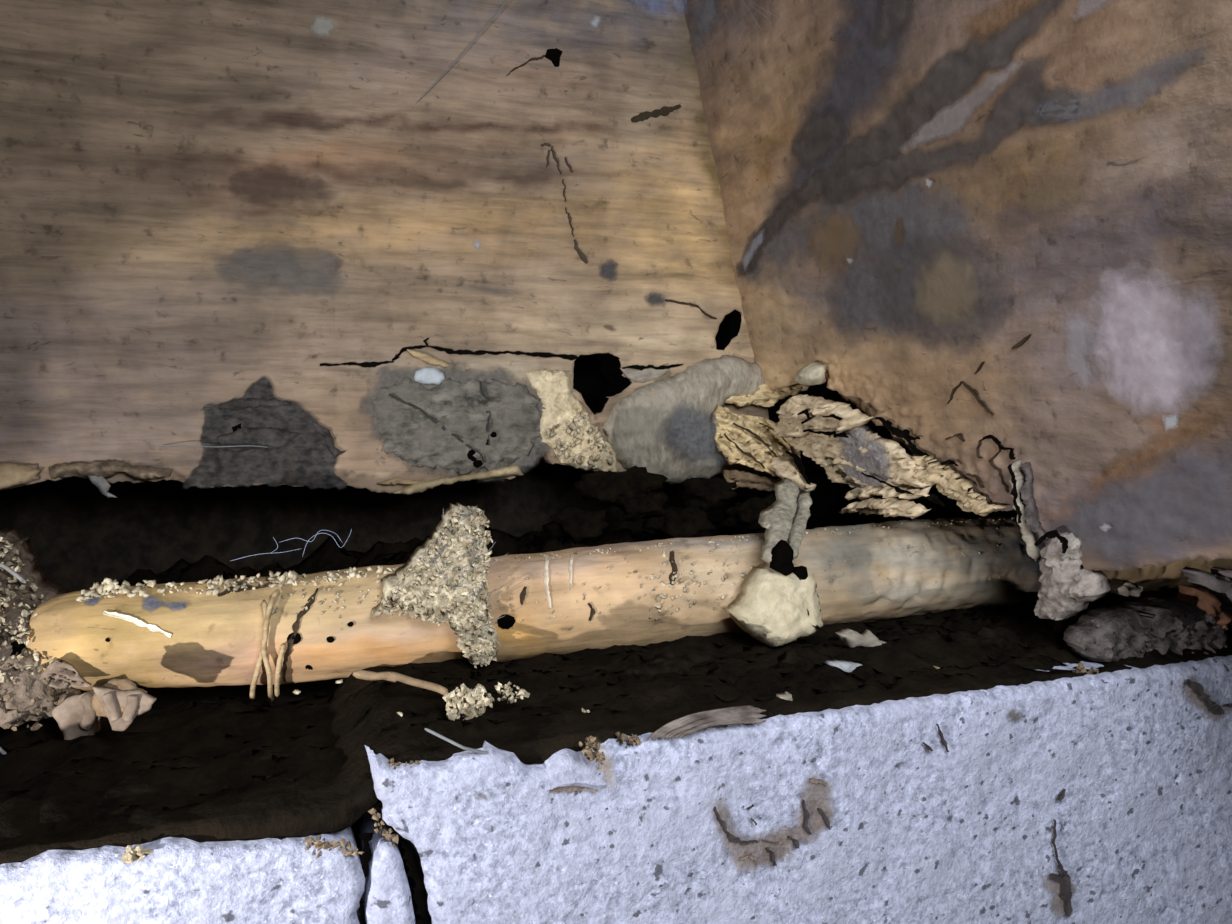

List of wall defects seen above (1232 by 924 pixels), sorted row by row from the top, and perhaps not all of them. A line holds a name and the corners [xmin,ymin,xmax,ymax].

crack [541,143,588,264]
water stain [738,0,1201,343]
peeling [202,398,299,452]
peeling [312,421,345,458]
crack [320,338,578,463]
peeling [392,432,524,495]
crack [665,299,717,319]
peeling [712,378,1007,516]
crack [875,361,1015,493]
crack [1012,334,1031,349]
water stain [1069,276,1216,428]
crack [1044,788,1076,917]